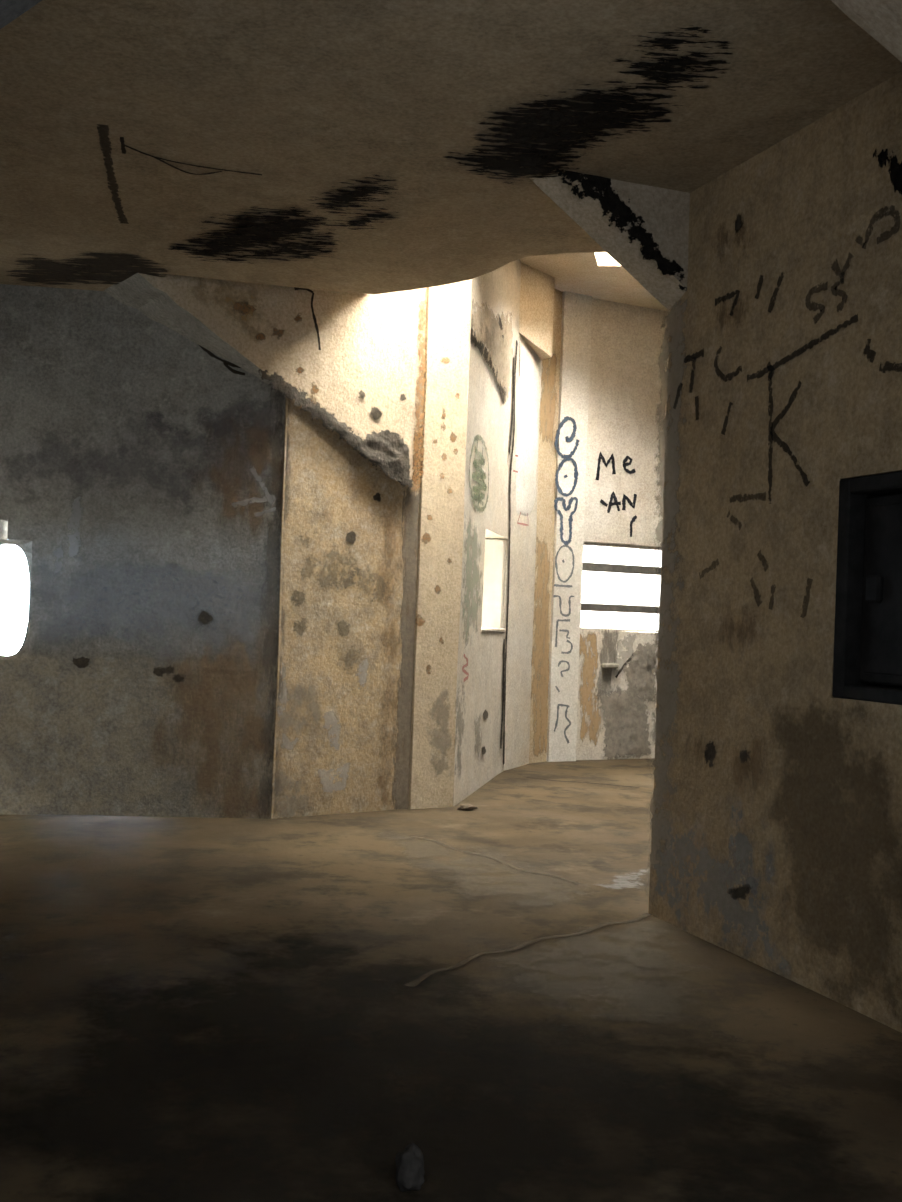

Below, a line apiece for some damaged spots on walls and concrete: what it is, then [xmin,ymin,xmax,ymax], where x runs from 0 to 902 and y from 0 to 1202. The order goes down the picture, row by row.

spalling [258,369,413,488]